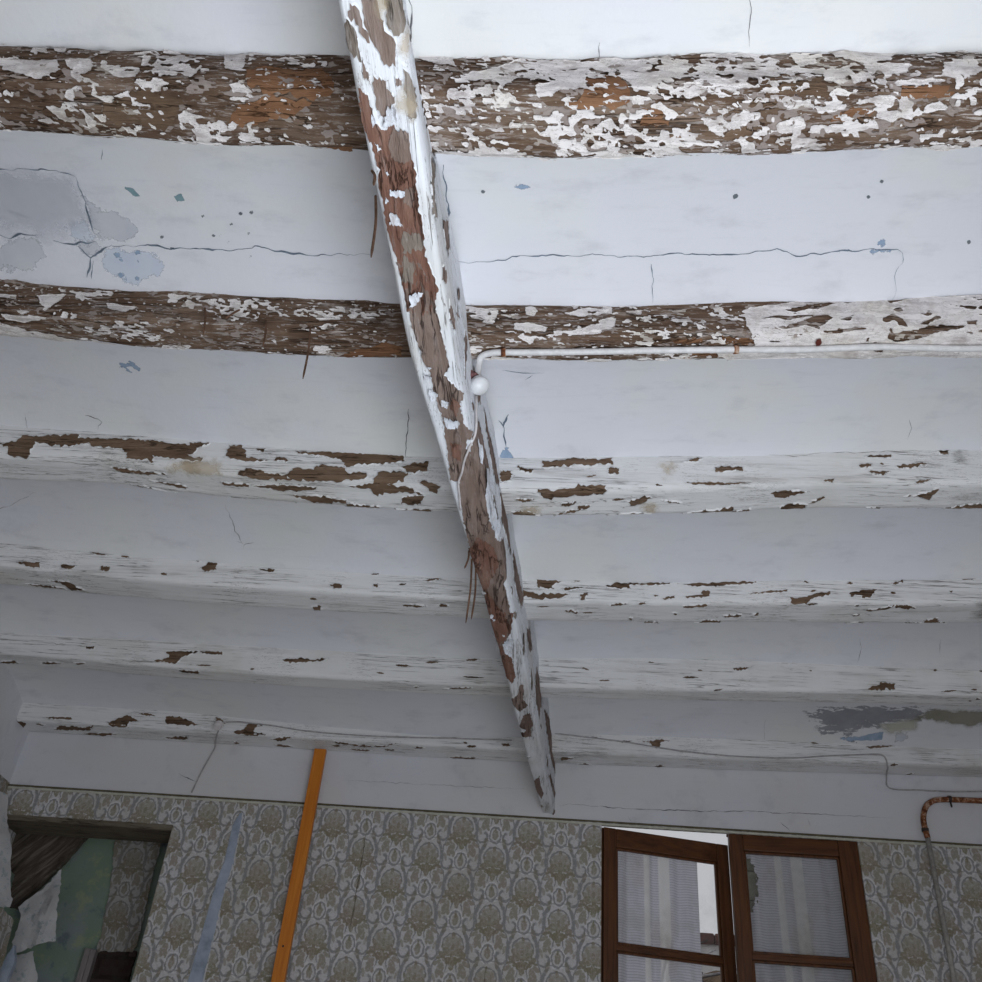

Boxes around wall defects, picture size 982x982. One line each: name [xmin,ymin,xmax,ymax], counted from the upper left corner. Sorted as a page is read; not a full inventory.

crack [0,168,370,279]
crack [464,248,904,297]
peeling [0,0,982,683]
peeling [867,681,896,692]
peeling [17,712,198,740]
peeling [215,717,295,748]
peeling [331,740,401,752]
peeling [511,665,594,800]
peeling [620,739,672,749]
peeling [534,776,544,808]